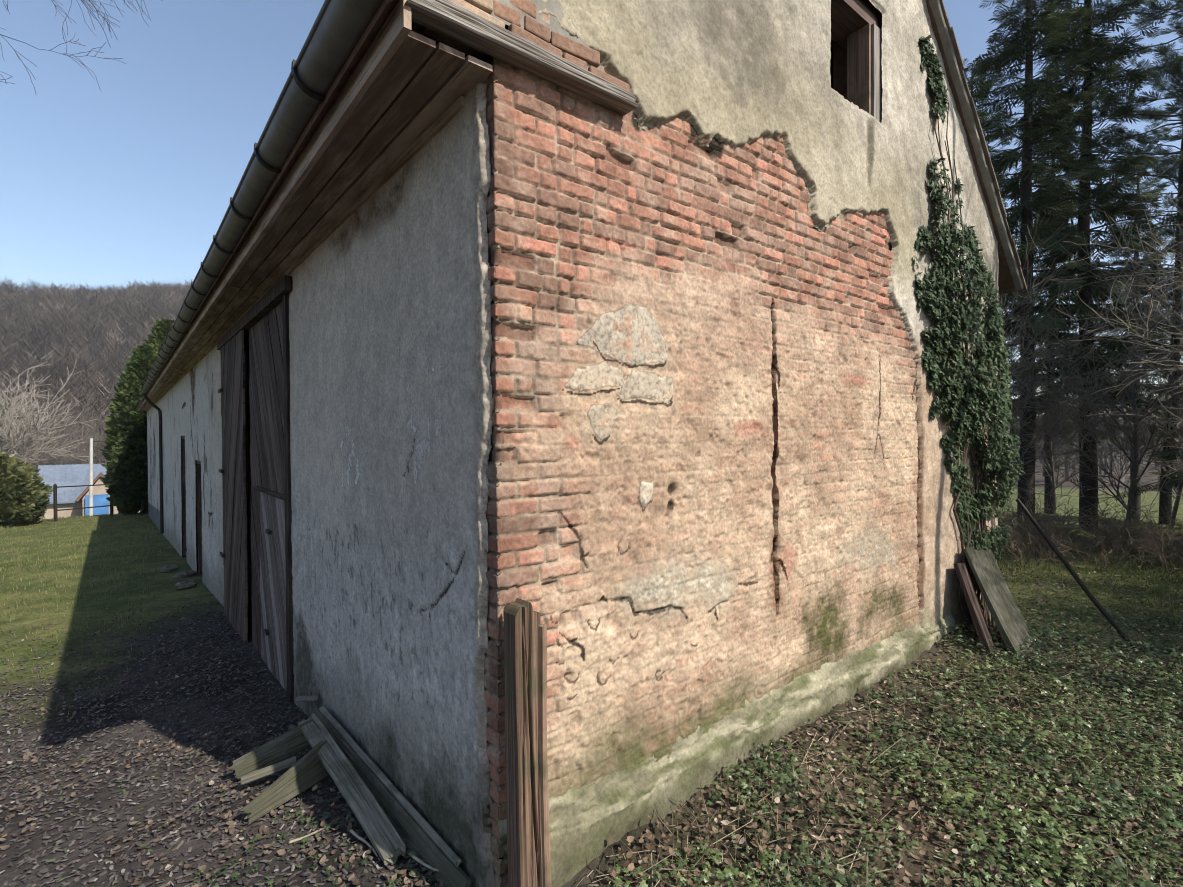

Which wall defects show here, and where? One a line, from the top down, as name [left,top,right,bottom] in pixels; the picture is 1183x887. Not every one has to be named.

crack [421,552,465,618]
crack [551,343,788,700]
flaking render [472,58,921,887]